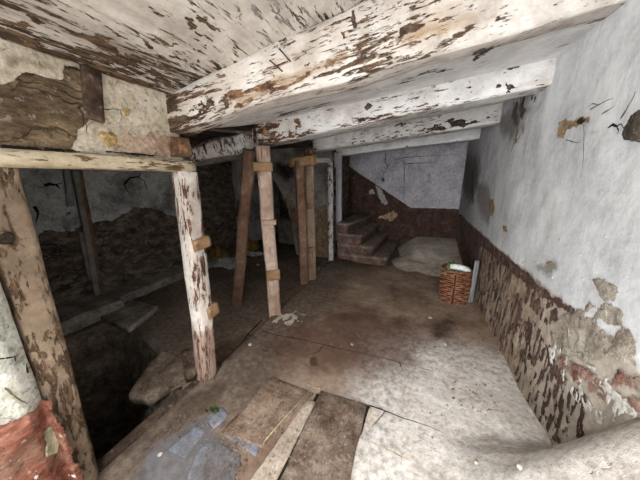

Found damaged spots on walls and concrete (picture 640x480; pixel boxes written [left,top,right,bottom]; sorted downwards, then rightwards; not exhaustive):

peeling [185,16,221,63]
peeling [398,23,425,38]
flaking render [0,60,182,151]
peeling [166,63,311,124]
flaking render [622,110,640,142]
leakage [463,155,478,201]
flaking render [38,222,93,306]
flaking render [92,207,183,292]
crack [214,320,431,380]
flaking render [459,214,640,443]
flaking render [0,397,84,480]
crack [369,405,446,434]